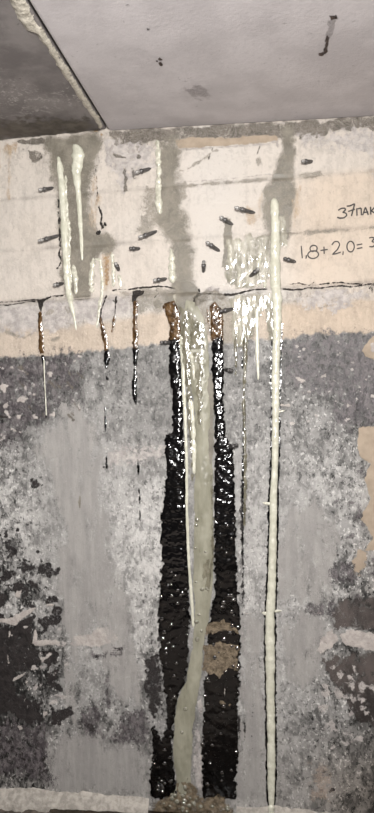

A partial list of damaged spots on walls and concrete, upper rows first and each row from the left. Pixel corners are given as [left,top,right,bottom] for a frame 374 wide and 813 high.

crack [1,294,64,311]
crack [99,285,175,318]
corrosion [163,300,181,343]
leakage [0,114,374,480]
corrosion [206,302,224,341]
crack [193,281,372,304]
peeling [280,327,374,576]